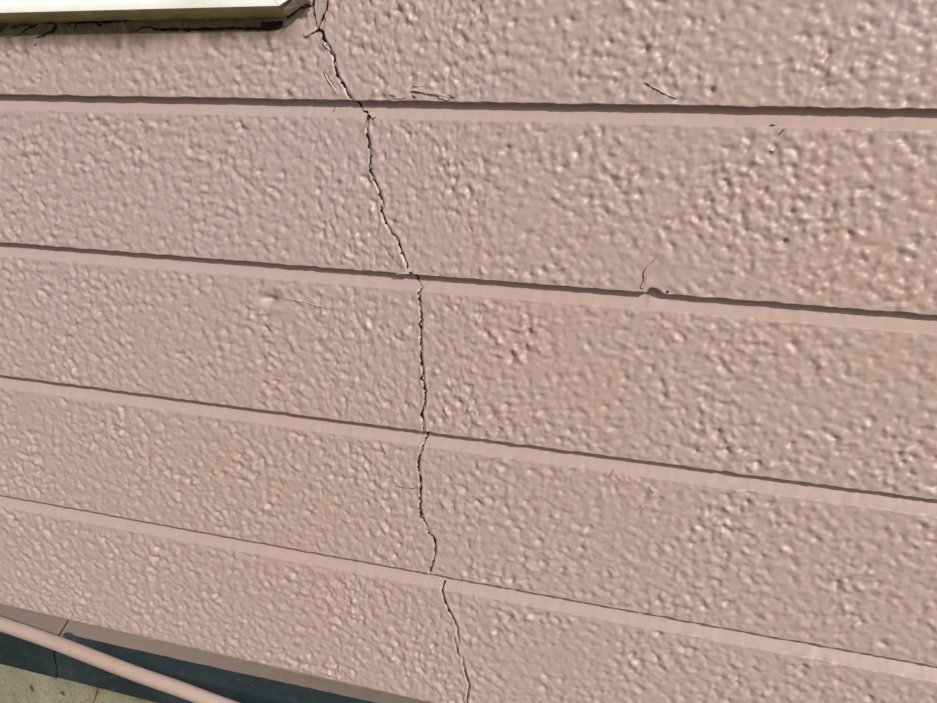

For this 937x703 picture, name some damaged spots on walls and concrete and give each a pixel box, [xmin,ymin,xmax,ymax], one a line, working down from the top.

crack [0,0,470,699]